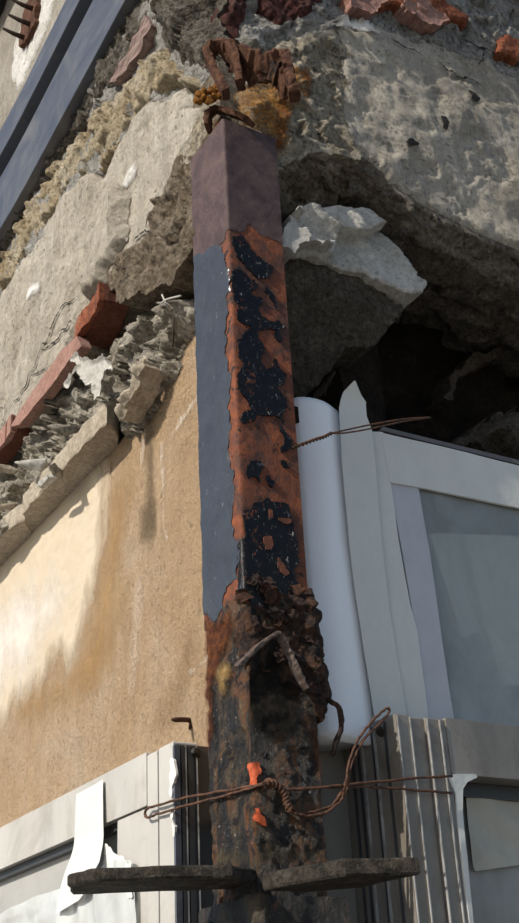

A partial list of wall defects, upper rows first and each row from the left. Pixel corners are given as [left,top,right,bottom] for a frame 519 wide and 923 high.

spalling [339,0,469,35]
corrosion [239,84,291,149]
spalling [230,29,519,380]
crack [0,294,79,429]
peeling [64,352,112,400]
peeling [74,104,300,623]
leakage [141,431,154,538]
corrosion [204,573,345,757]